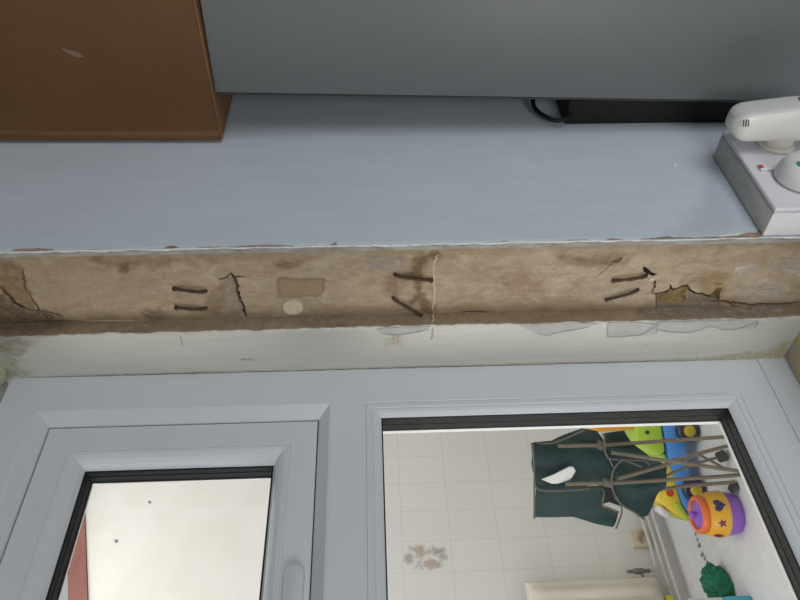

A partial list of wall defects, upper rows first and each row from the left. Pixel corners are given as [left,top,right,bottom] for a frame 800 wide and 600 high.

peeling [0,230,800,254]
crack [0,270,64,318]
crack [219,273,247,316]
rust [406,253,439,314]
spalling [595,267,723,307]
crack [708,299,799,307]
peeling [377,327,429,336]
peeling [522,320,758,338]